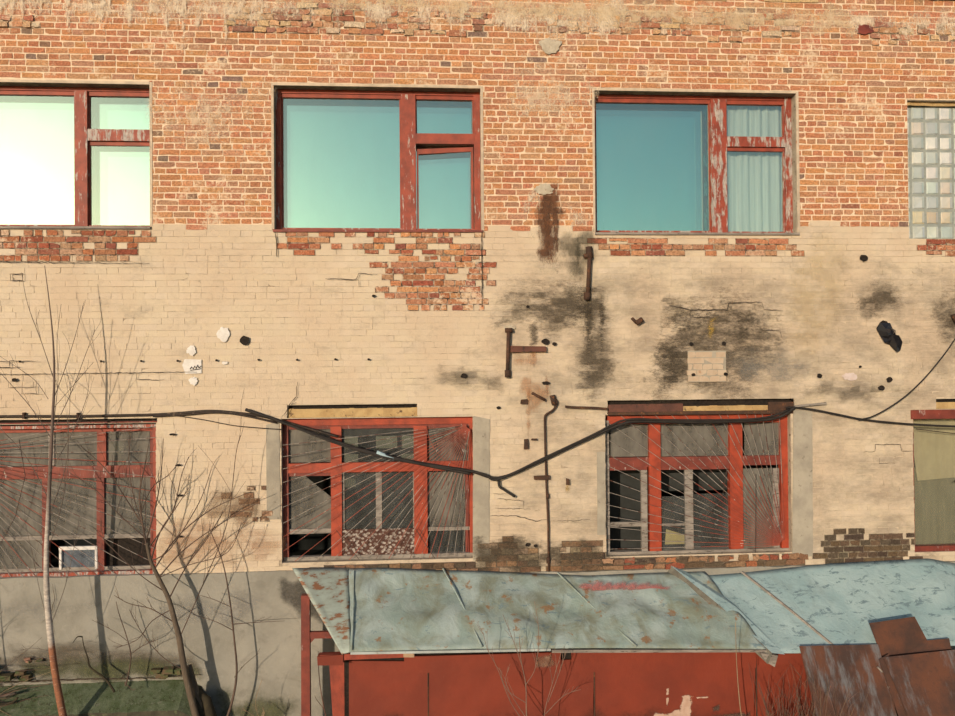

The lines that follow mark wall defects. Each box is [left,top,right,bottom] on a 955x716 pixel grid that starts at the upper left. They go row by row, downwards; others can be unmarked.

peeling [0,230,156,262]
peeling [277,231,497,311]
leakage [560,233,592,274]
peeling [917,239,955,257]
leakage [585,304,605,338]
peeling [221,486,273,522]
spalling [324,528,923,573]
peeling [654,688,708,716]